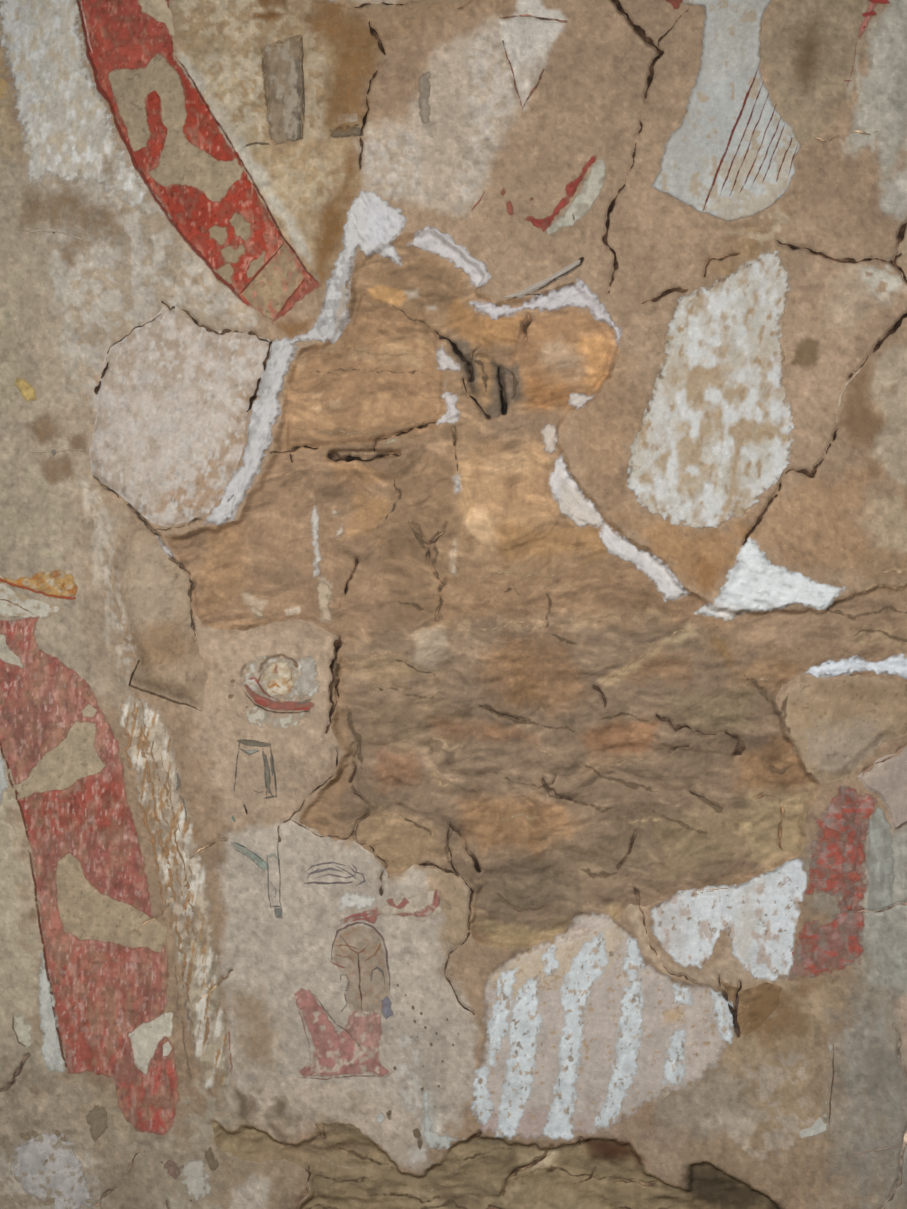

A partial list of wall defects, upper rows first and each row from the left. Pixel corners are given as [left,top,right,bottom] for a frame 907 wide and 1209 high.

crack [338,2,407,168]
crack [500,14,567,109]
crack [602,0,688,293]
crack [642,252,740,304]
crack [777,222,907,283]
crack [94,301,272,412]
crack [270,422,456,463]
crack [436,332,507,419]
crack [742,313,907,545]
crack [30,449,200,639]
spalling [156,191,907,951]
spalling [211,1120,783,1209]